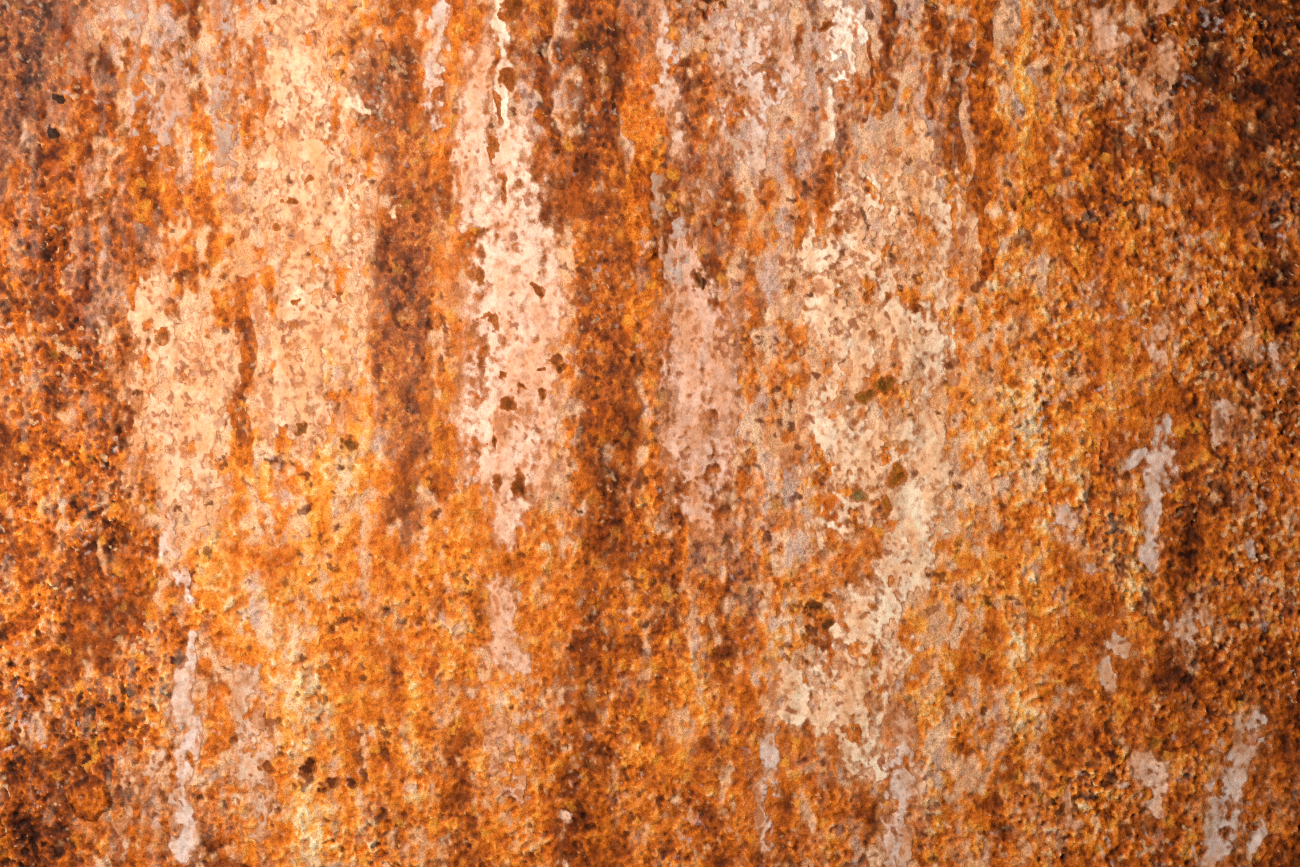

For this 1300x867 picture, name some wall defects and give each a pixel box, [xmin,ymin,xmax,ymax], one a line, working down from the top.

corrosion [127,76,162,226]
corrosion [190,125,211,203]
corrosion [862,0,905,123]
corrosion [924,0,1002,280]
corrosion [1013,0,1069,230]
corrosion [227,276,257,470]
corrosion [346,20,514,637]
corrosion [529,0,666,867]
corrosion [115,500,159,623]
corrosion [210,498,296,649]
corrosion [67,775,112,821]